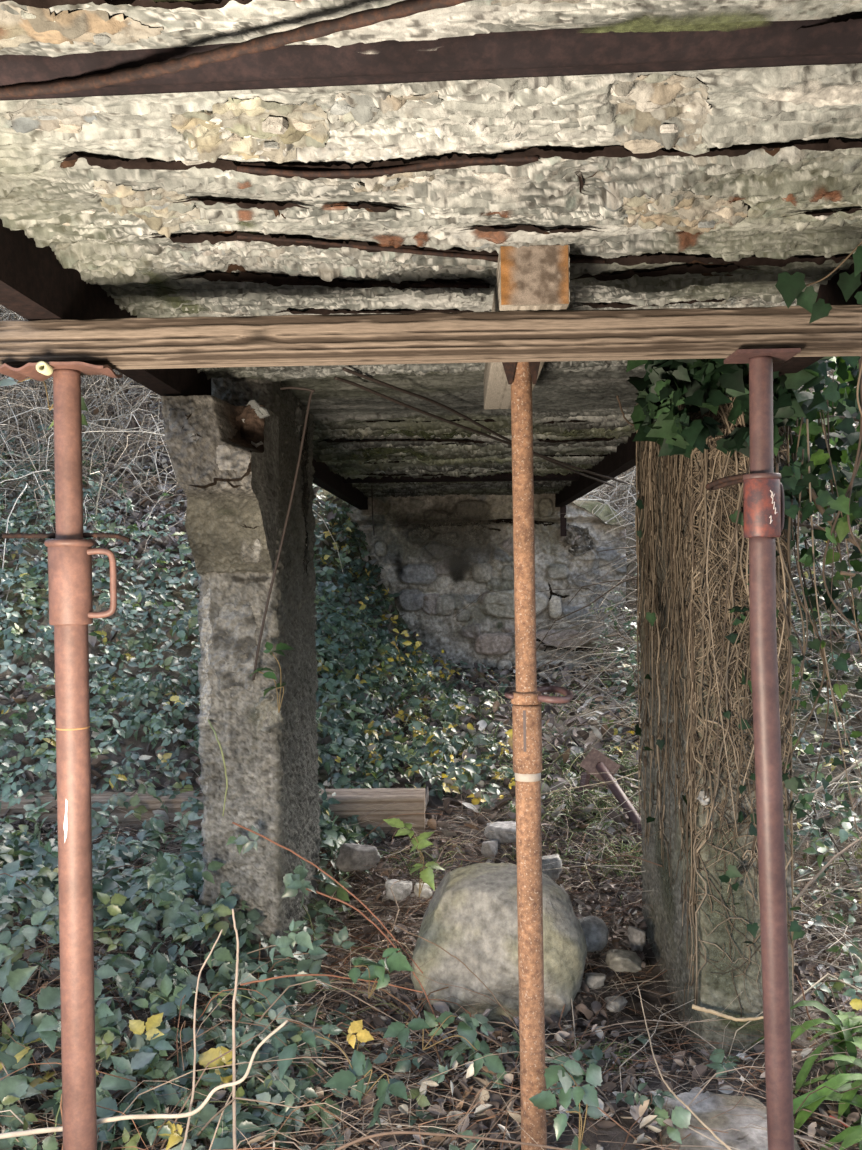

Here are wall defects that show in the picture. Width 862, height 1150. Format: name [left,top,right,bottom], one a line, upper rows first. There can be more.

spalling [170,91,444,165]
spalling [353,171,434,193]
spalling [81,180,210,238]
rust [322,202,347,210]
spalling [622,190,751,235]
rust [374,232,428,248]
spalling [216,400,270,473]
crack [189,450,252,488]